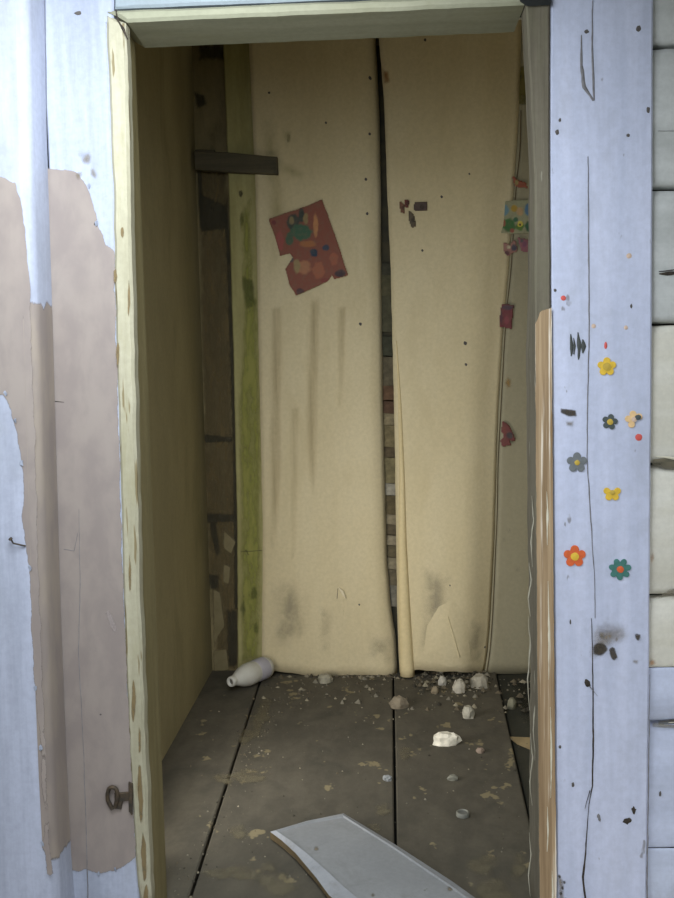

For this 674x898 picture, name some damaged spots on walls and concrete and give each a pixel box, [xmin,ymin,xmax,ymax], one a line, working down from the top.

peeling [0,169,148,898]
leakage [240,265,259,657]
crack [582,166,595,898]
crack [659,268,674,276]